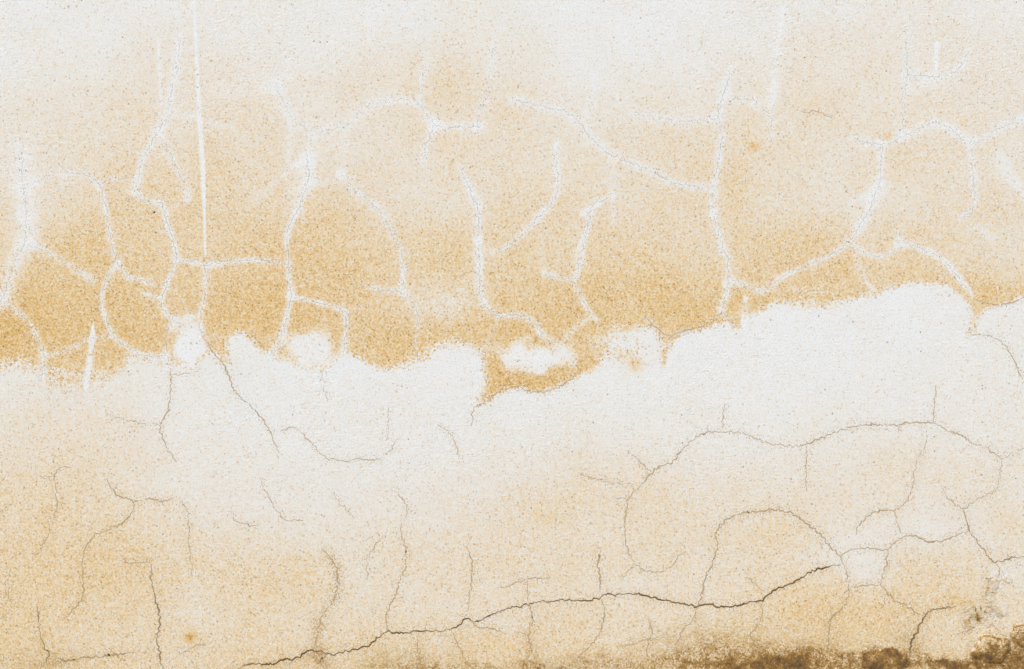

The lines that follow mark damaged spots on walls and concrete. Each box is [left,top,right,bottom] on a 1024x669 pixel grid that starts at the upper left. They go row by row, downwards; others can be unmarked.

crack [0,25,432,529]
leakage [172,0,277,262]
leakage [123,113,1024,512]
crack [441,51,832,466]
leakage [728,0,894,279]
crack [838,217,1024,384]
crack [32,462,72,557]
crack [0,478,206,669]
leakage [0,317,1024,669]
crack [237,386,1024,669]